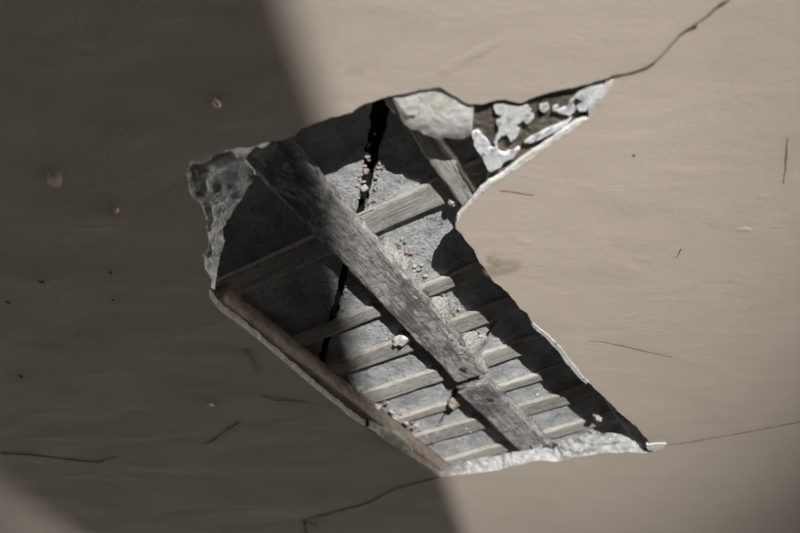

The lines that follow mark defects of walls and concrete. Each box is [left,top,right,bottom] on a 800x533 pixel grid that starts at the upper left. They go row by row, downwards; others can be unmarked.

crack [611,0,729,79]
spalling [392,77,613,222]
spalling [187,142,270,290]
spalling [531,321,589,384]
crack [1,453,118,463]
spalling [366,419,413,456]
spalling [445,431,666,476]